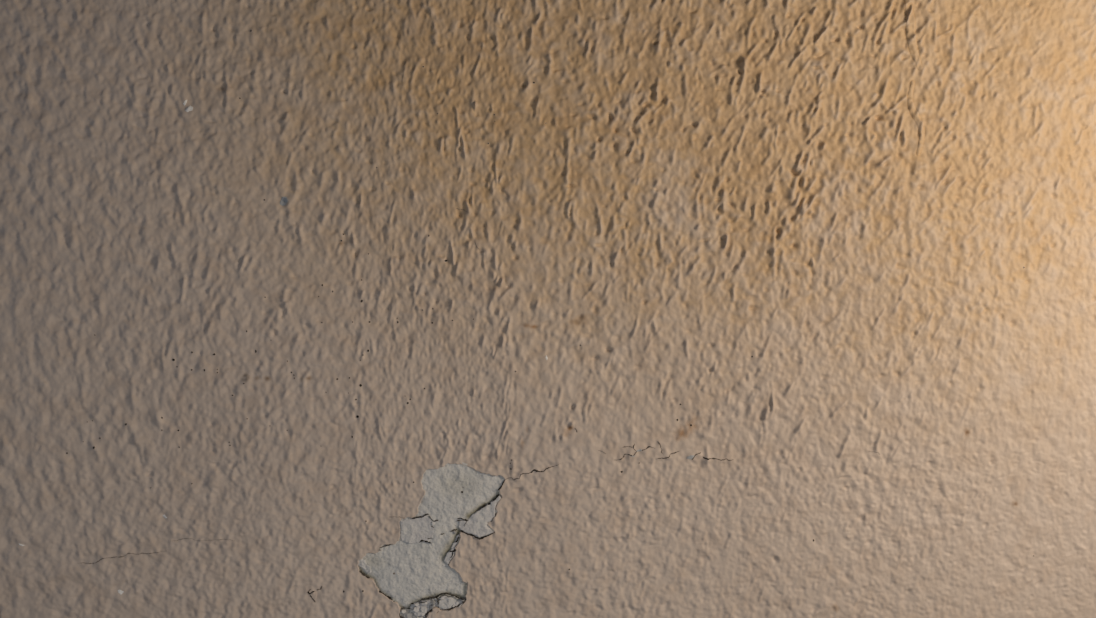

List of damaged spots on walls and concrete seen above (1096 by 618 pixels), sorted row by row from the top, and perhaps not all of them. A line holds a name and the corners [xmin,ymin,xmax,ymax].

crack [598,442,731,461]
crack [505,464,559,480]
peeling [358,462,505,618]